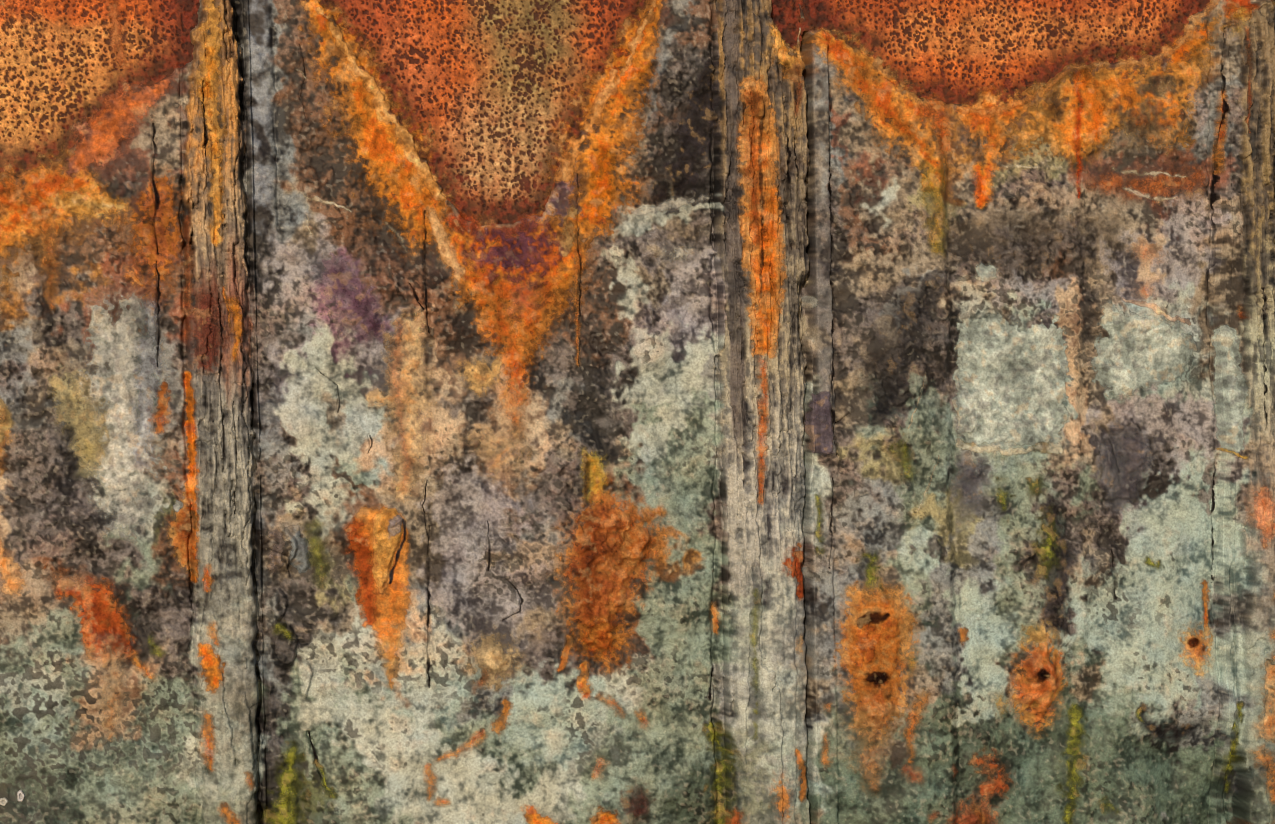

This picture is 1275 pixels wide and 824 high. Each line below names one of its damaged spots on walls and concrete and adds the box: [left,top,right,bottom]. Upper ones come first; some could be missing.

rust [195,0,228,245]
rust [771,0,1275,252]
rust [0,77,242,596]
rust [298,0,667,478]
rust [737,77,787,503]
rust [43,565,152,739]
rust [202,714,215,770]
rust [198,623,226,693]
rust [220,802,240,824]
rust [904,691,931,782]
rust [970,749,1014,801]